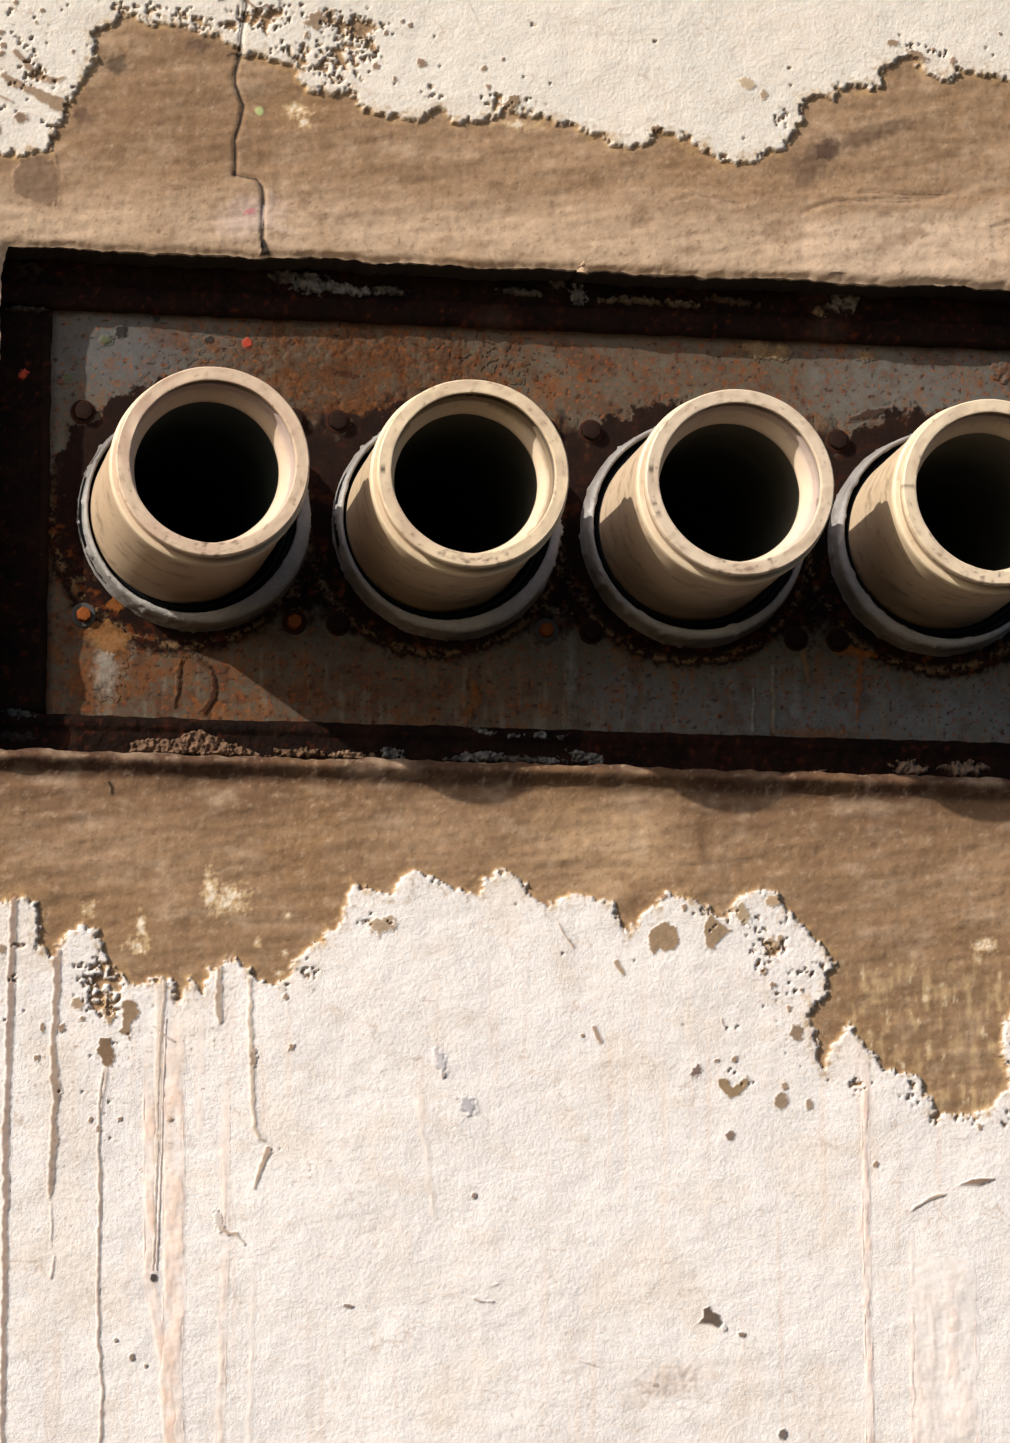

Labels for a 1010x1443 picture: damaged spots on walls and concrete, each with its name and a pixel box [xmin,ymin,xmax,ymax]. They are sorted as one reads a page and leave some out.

water stain [11,151,61,207]
water stain [101,49,131,80]
crack [216,0,280,258]
water stain [783,112,932,202]
rust [48,318,1010,739]
water stain [0,891,20,1443]
water stain [45,948,63,1280]
water stain [94,1066,110,1443]
water stain [149,976,176,1282]
water stain [213,960,225,1026]
water stain [245,975,273,1190]
water stain [451,1091,480,1118]